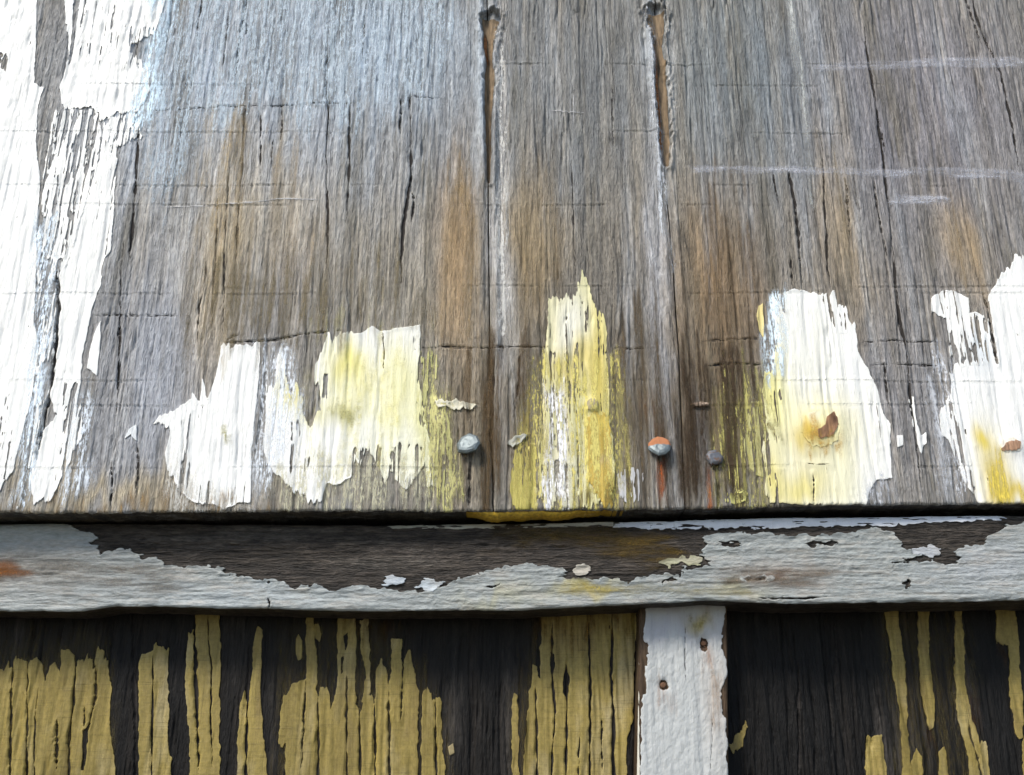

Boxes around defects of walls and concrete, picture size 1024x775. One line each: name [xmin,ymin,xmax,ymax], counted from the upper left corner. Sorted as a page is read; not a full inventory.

peeling [0,0,165,509]
crack [398,89,441,282]
peeling [0,254,1024,775]